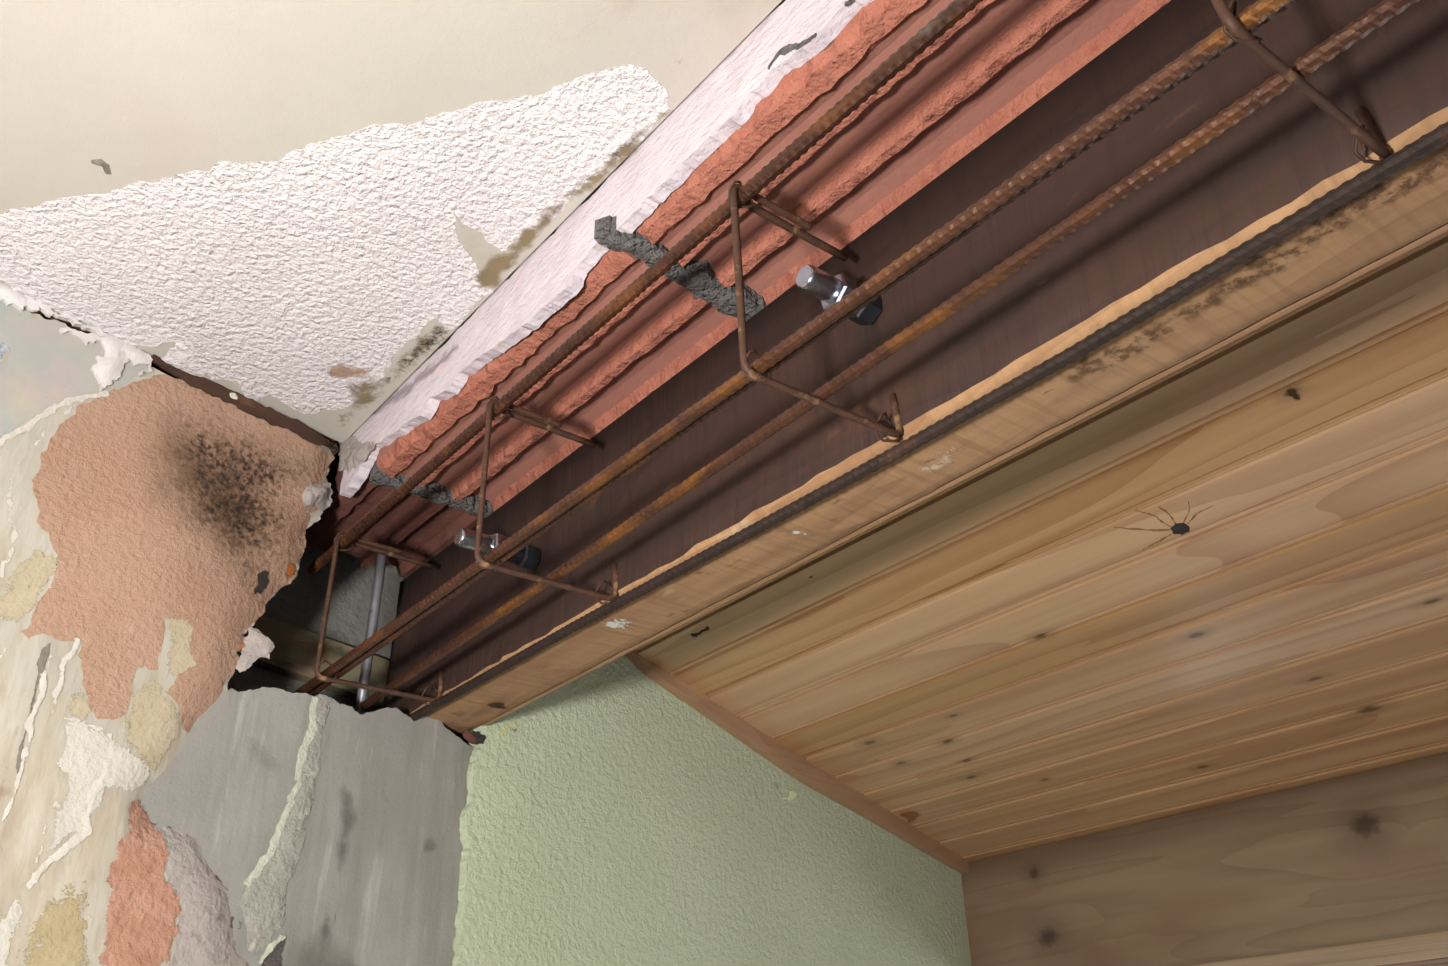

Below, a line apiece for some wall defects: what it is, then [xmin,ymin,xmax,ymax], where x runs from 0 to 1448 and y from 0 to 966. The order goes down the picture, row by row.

spalling [0,0,1448,732]
leakage [189,435,280,552]
leakage [254,570,269,594]
flaking render [99,800,250,966]